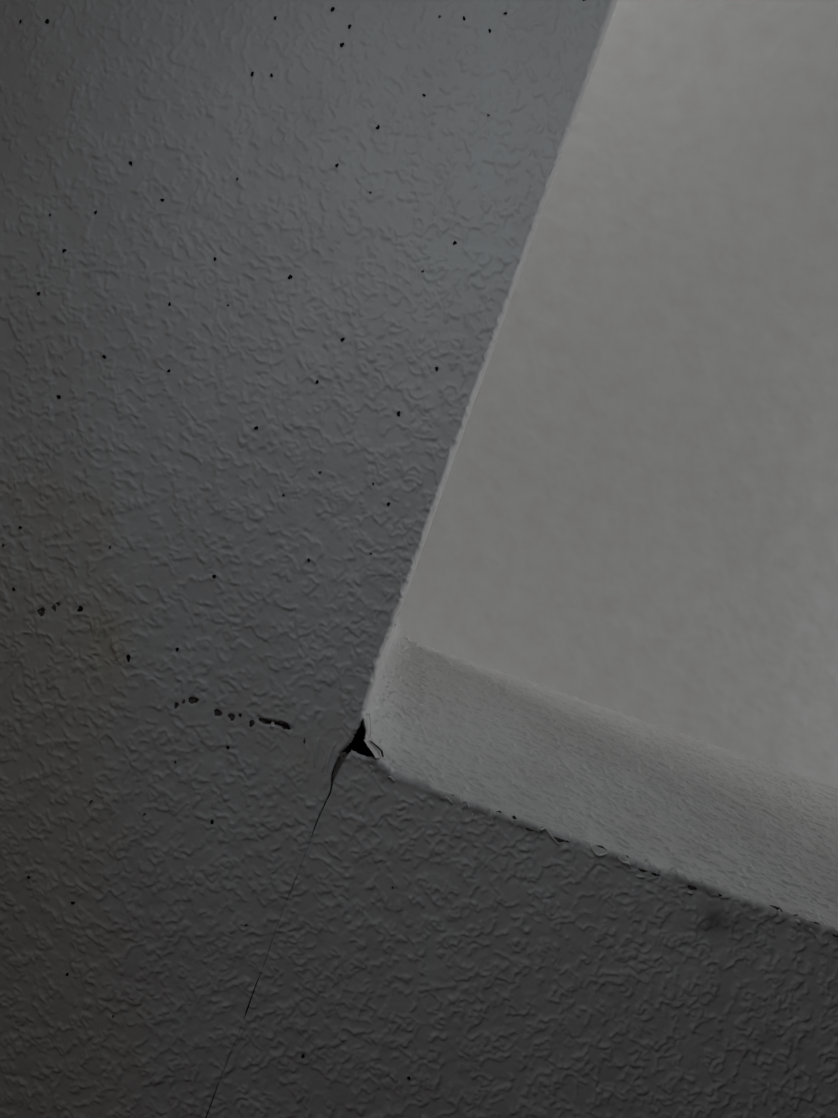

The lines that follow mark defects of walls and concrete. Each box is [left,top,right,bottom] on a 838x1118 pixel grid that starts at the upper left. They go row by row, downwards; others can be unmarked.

crack [205,785,333,1118]